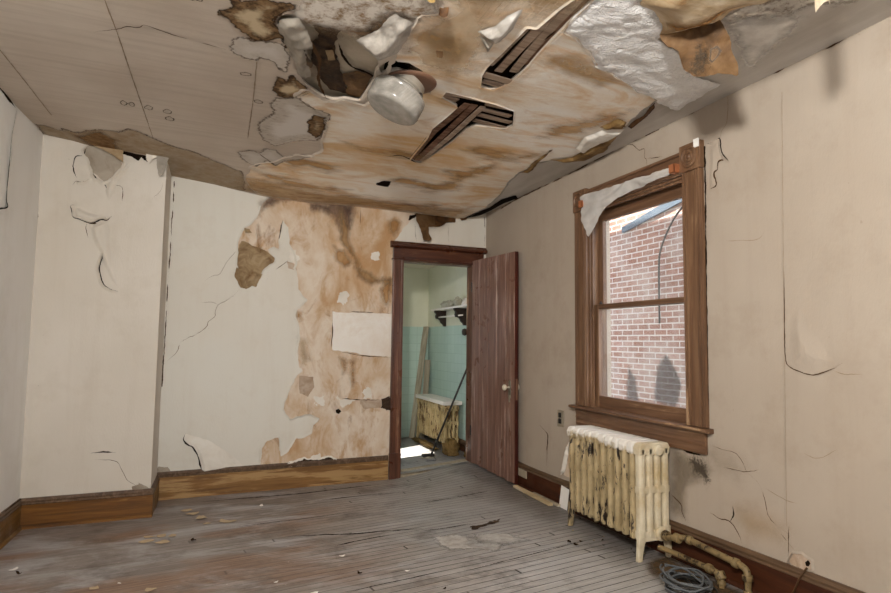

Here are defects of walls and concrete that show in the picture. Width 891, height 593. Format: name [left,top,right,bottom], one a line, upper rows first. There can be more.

crack [0,88,18,214]
flaking render [73,144,148,201]
crack [161,181,239,387]
flaking render [234,0,720,467]
crack [704,111,729,353]
flaking render [561,443,569,477]
leakage [675,456,709,508]
crack [684,448,795,553]